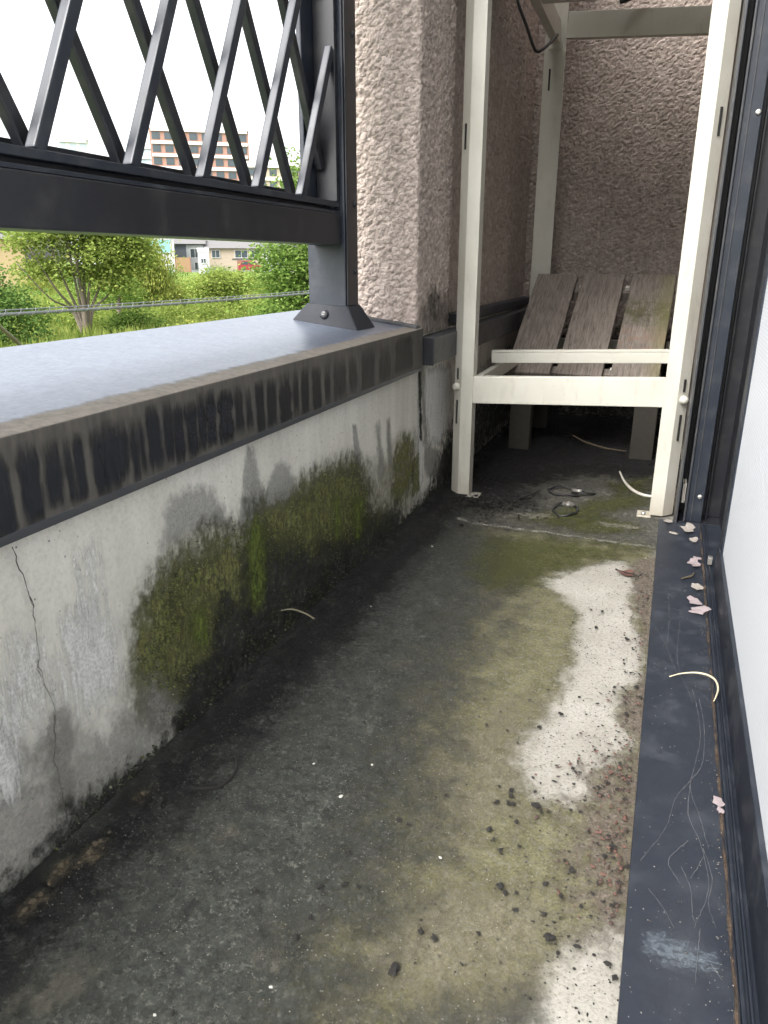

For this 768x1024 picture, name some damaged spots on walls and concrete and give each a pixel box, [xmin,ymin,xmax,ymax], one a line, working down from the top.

crack [12,547,72,837]
water stain [0,365,681,1024]